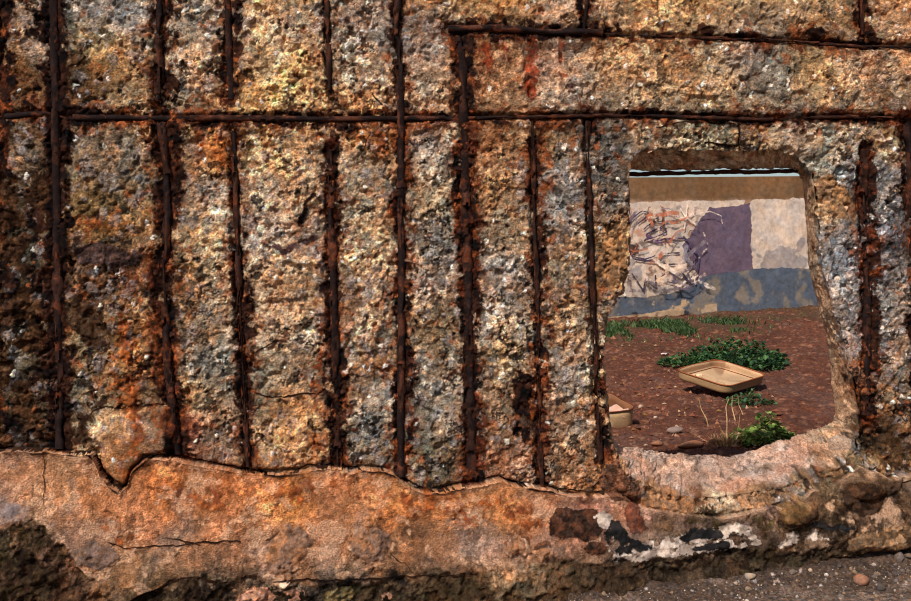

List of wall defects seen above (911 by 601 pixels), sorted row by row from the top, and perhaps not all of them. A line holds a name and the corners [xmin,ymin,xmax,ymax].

spalling [2,0,50,113]
spalling [59,0,458,116]
rust [637,0,911,57]
rust [310,135,353,468]
spalling [0,40,911,498]
rust [847,138,886,441]
crack [0,446,605,505]
leakage [0,521,74,601]
crack [108,537,241,549]
leakage [308,568,412,601]
crack [273,553,463,583]
leakage [701,496,861,579]